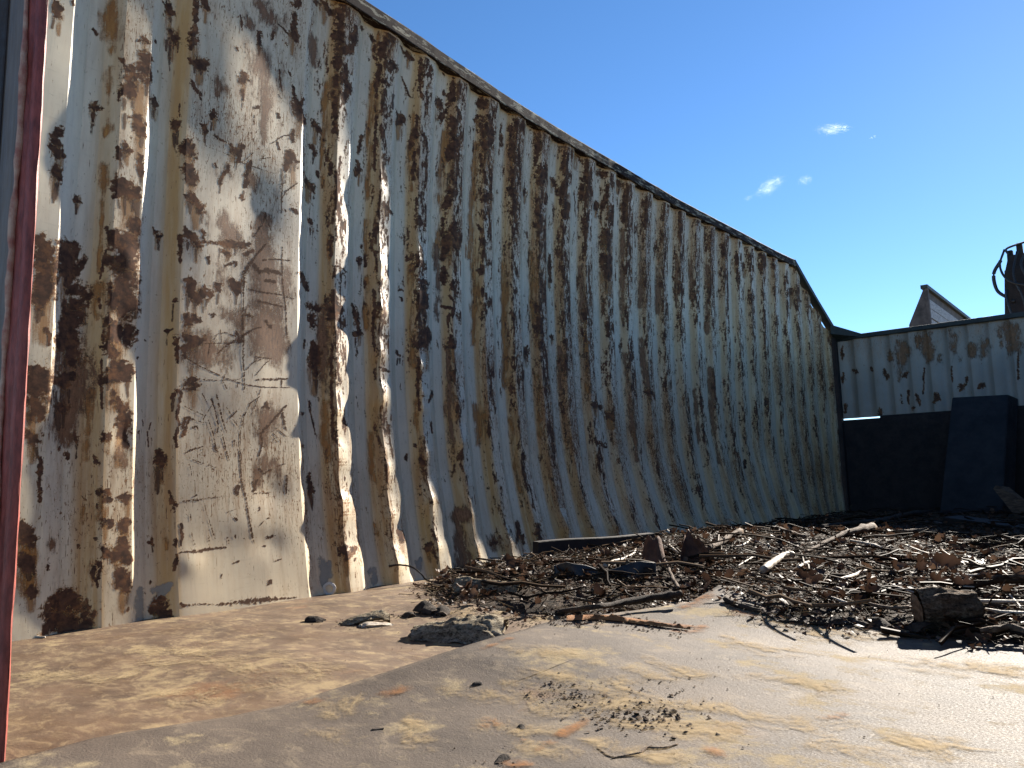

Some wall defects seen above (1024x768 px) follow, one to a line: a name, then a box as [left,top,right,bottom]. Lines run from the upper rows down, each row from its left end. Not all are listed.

corrosion [24,0,802,571]
corrosion [840,321,1024,409]
corrosion [17,518,102,636]
corrosion [80,485,134,614]
corrosion [148,580,186,618]
corrosion [337,544,358,577]